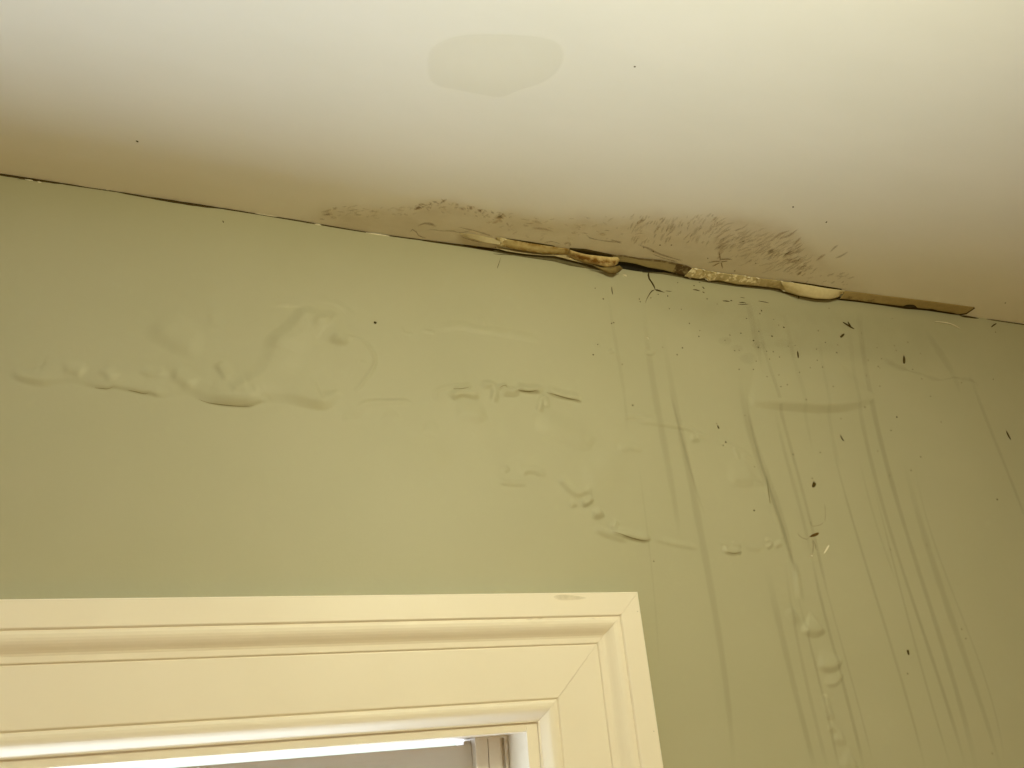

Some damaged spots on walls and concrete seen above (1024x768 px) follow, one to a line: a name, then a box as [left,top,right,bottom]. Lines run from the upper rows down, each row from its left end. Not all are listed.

peeling [460,233,500,245]
peeling [780,281,845,299]